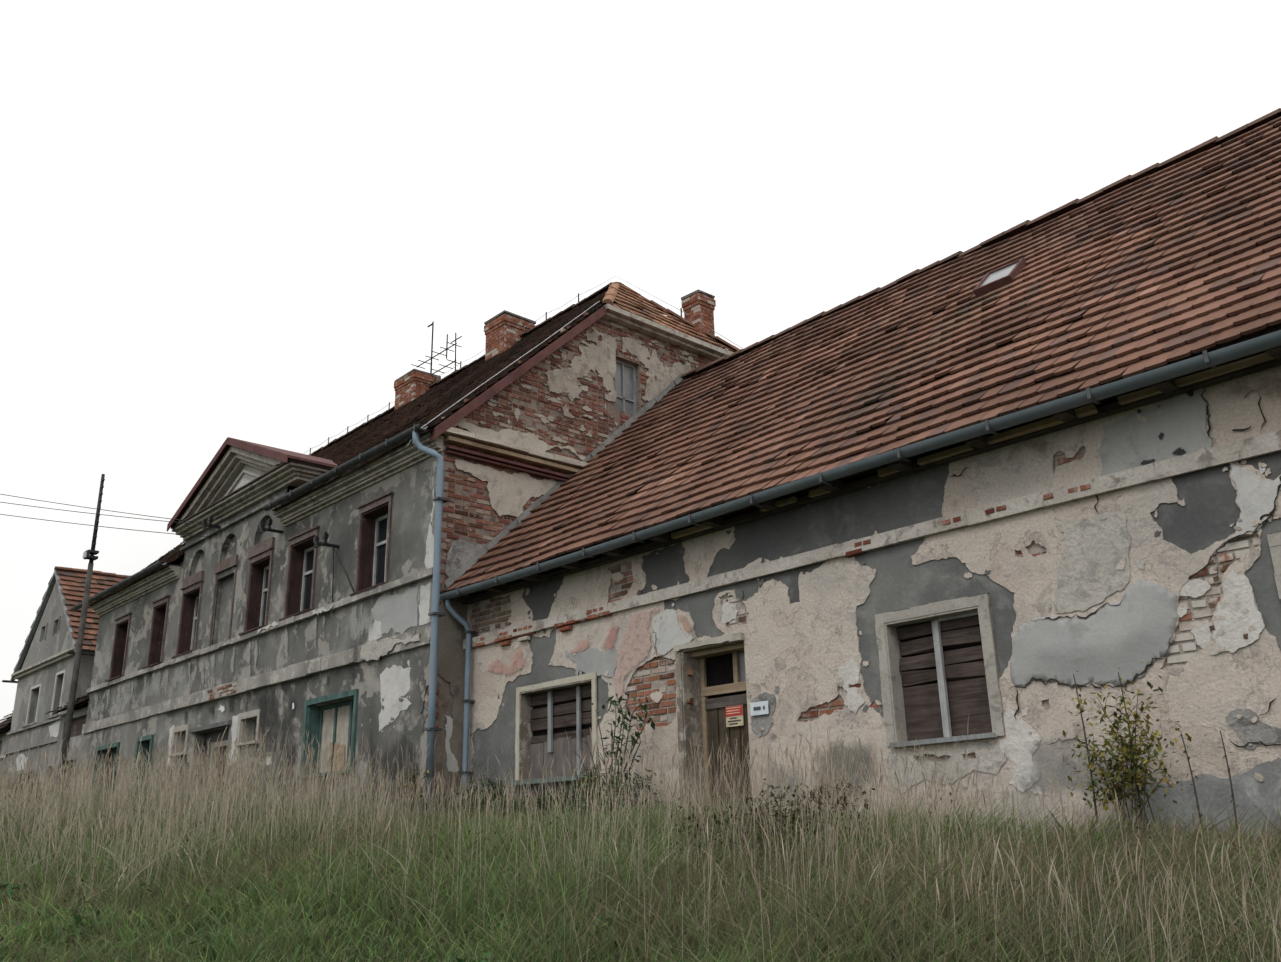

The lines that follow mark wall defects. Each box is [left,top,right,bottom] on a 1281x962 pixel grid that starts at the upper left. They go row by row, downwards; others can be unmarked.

peeling [479,374,618,449]
peeling [379,463,1016,814]
spalling [886,697,1047,795]
peeling [1151,451,1281,670]